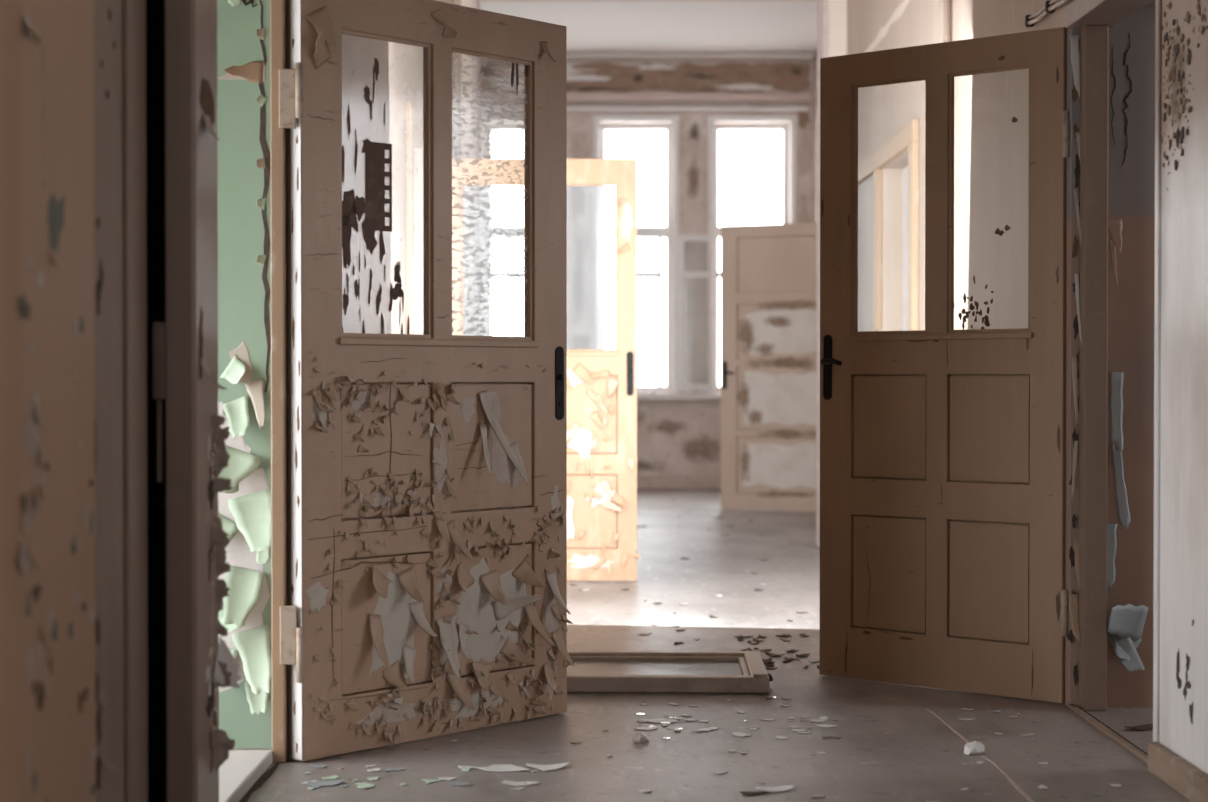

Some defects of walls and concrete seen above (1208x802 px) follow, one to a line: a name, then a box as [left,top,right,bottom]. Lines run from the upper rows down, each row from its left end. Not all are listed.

peeling [480,62,524,92]
peeling [540,41,812,177]
crack [1110,33,1132,165]
peeling [48,193,67,272]
flaking render [798,194,824,223]
peeling [96,260,104,316]
peeling [1107,372,1131,592]
peeling [199,309,271,773]
peeling [1107,603,1149,673]
peeling [1176,649,1193,724]